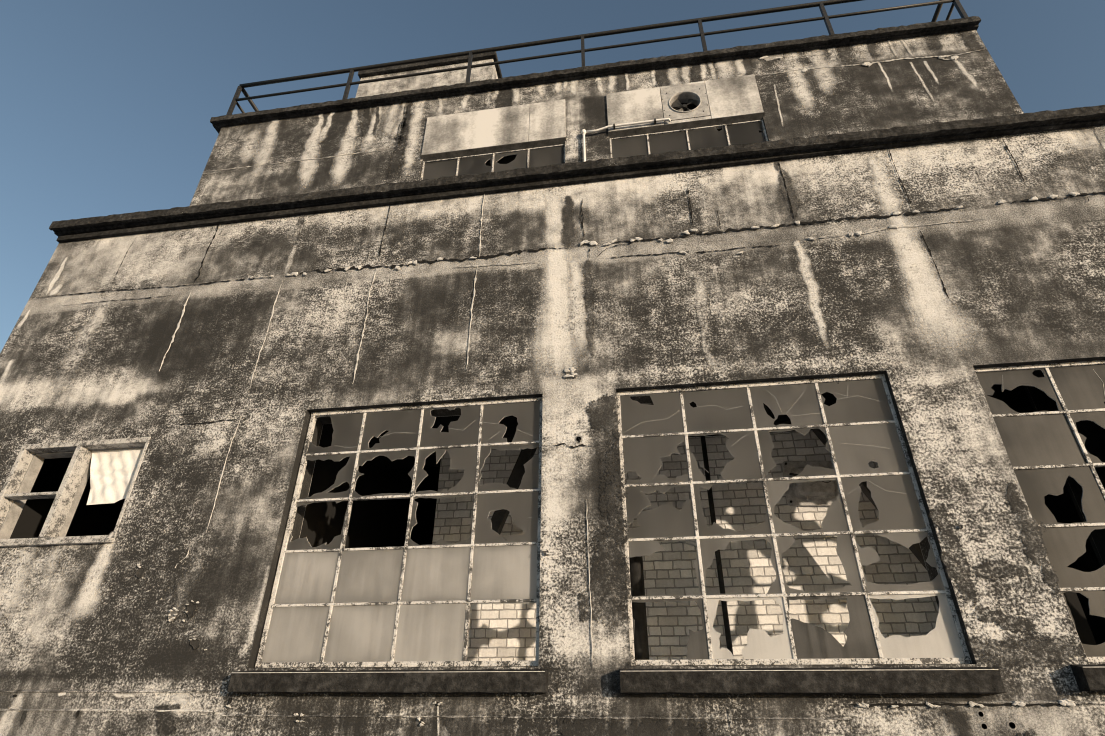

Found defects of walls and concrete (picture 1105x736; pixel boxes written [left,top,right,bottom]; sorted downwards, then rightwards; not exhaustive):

water stain [651,57,755,87]
water stain [784,45,857,109]
water stain [239,120,279,173]
water stain [298,112,335,186]
water stain [331,98,443,186]
water stain [534,191,596,376]
crack [38,139,1105,387]
water stain [793,241,828,345]
crack [555,438,591,448]
crack [163,412,243,568]
water stain [577,393,632,627]
water stain [155,704,181,736]